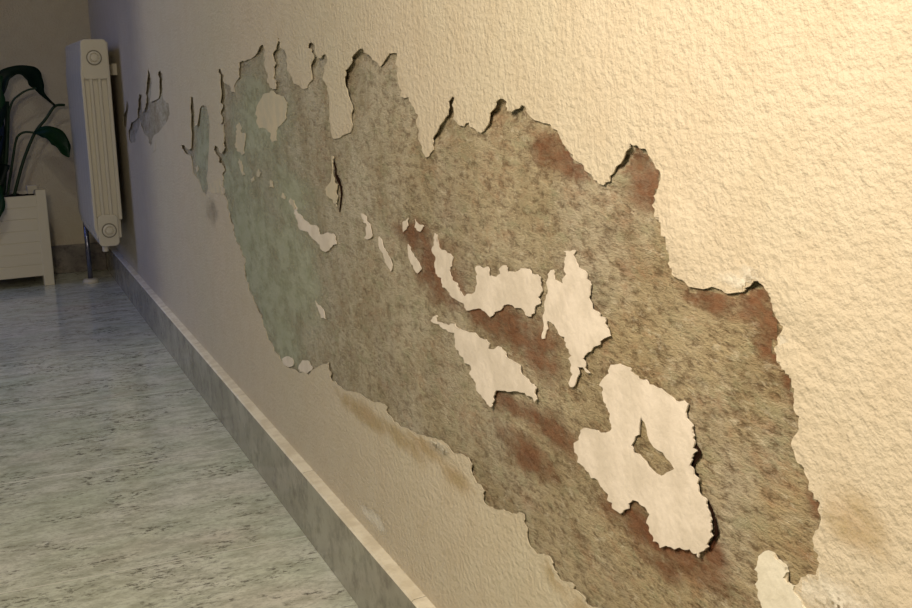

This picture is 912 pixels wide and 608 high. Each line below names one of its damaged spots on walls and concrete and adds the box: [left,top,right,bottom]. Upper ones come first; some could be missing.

peeling [123,70,170,153]
peeling [182,38,821,608]